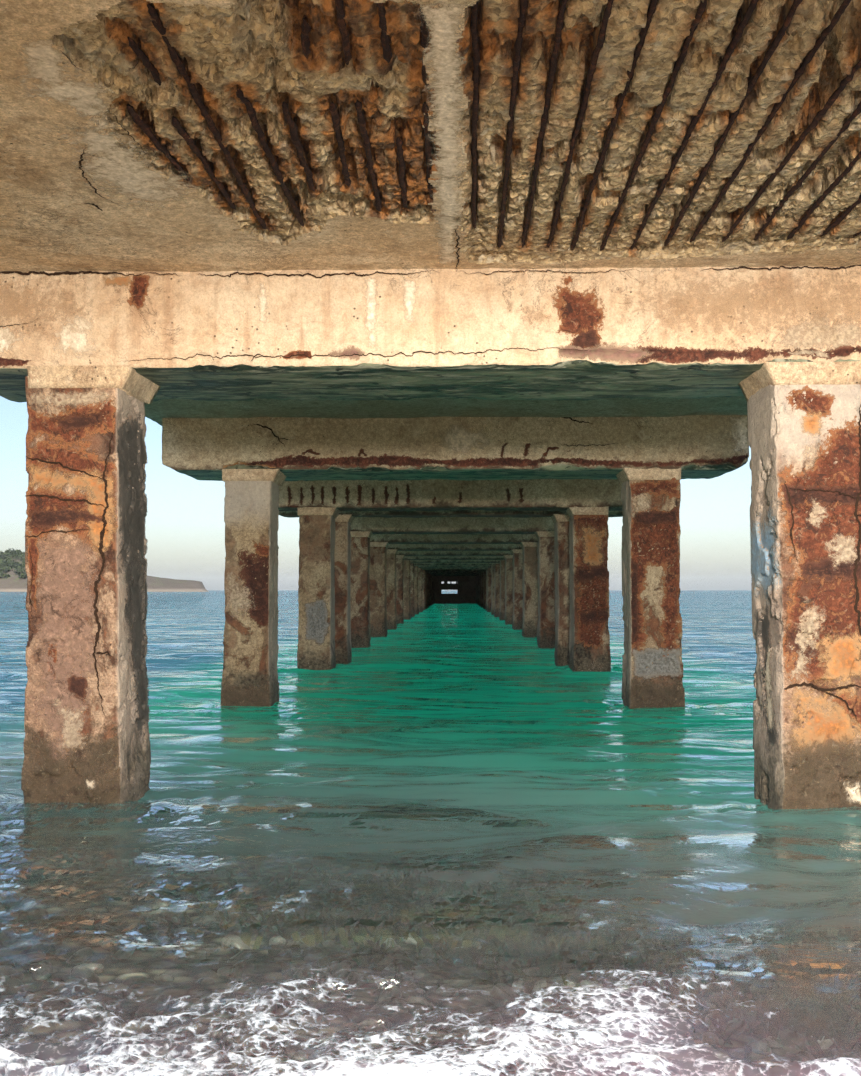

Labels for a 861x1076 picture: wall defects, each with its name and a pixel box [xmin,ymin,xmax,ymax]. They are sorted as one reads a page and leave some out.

spalling [22,0,442,245]
spalling [455,0,861,264]
corrosion [104,274,151,309]
crack [0,227,652,278]
corrosion [553,272,654,364]
crack [24,431,114,715]
corrosion [25,391,118,610]
corrosion [225,540,269,632]
corrosion [630,477,682,657]
corrosion [777,385,861,749]
crack [784,405,861,635]
crack [784,682,861,721]